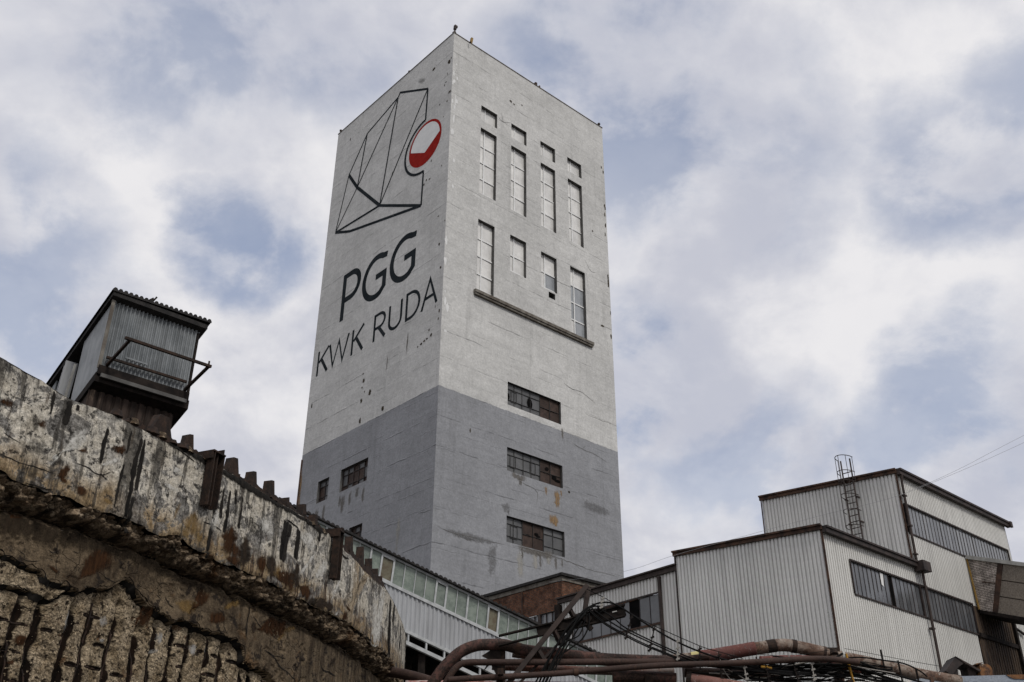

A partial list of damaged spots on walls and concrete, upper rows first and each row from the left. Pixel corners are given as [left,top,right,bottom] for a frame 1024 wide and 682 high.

spalling [0,554,276,682]
crack [0,545,297,682]
damp [0,428,351,664]
corrosion [222,527,240,565]
peeling [301,532,327,577]
peeling [326,562,385,647]